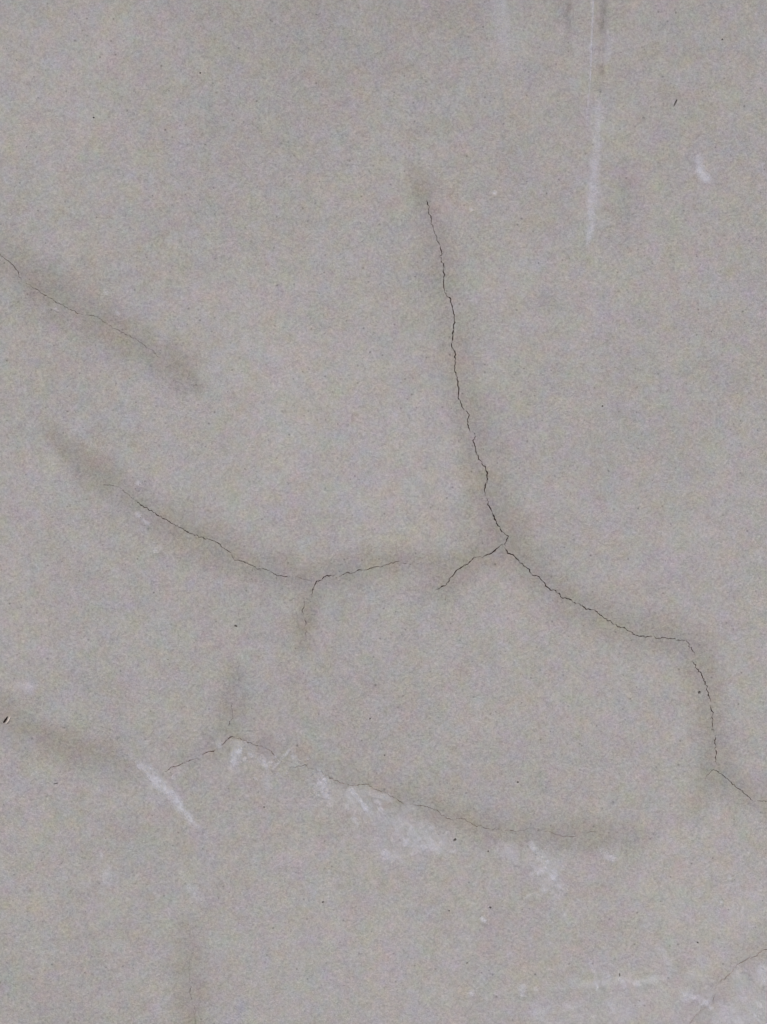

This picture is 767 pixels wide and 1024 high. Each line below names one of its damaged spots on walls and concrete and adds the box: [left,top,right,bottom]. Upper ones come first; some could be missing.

crack [104,484,407,622]
crack [427,202,767,802]